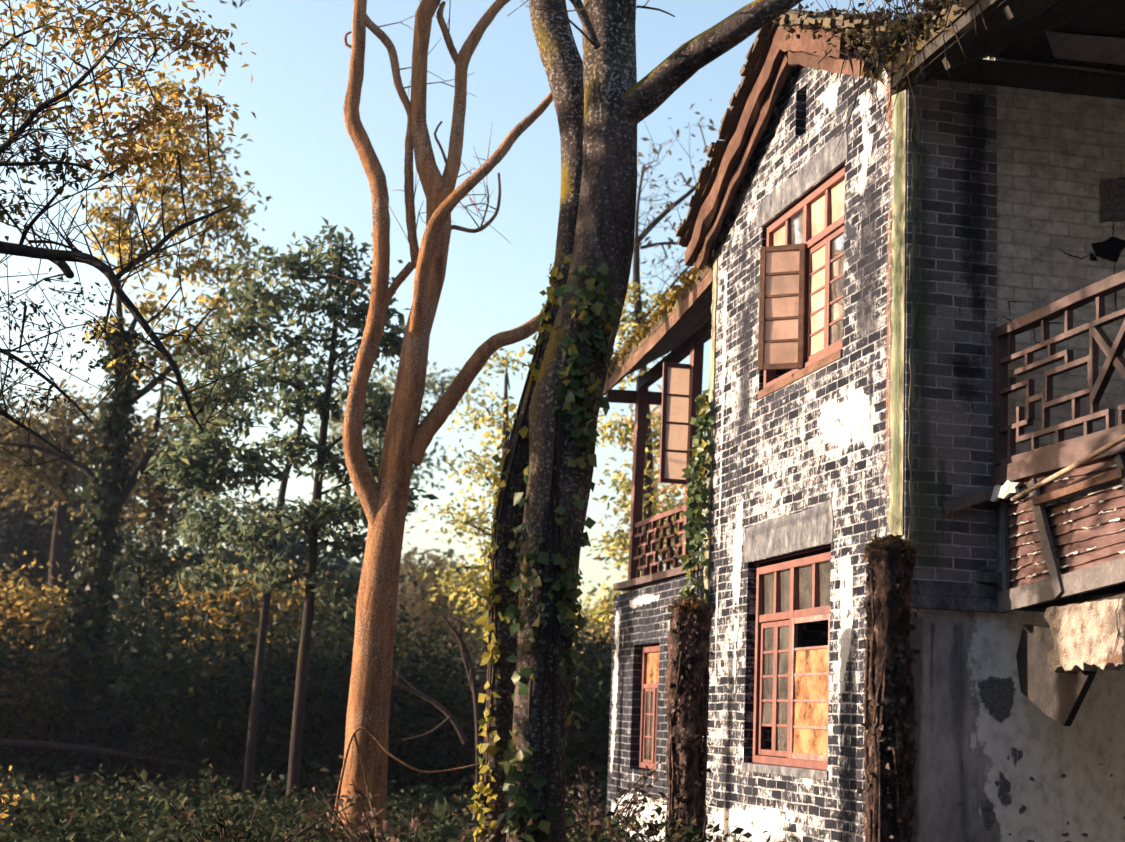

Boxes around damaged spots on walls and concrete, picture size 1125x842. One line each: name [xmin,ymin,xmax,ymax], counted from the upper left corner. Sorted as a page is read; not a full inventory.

leakage [857,183,879,339]
leakage [738,305,750,426]
peeling [997,488,1096,599]
peeling [1046,485,1125,531]
peeling [961,610,1125,842]